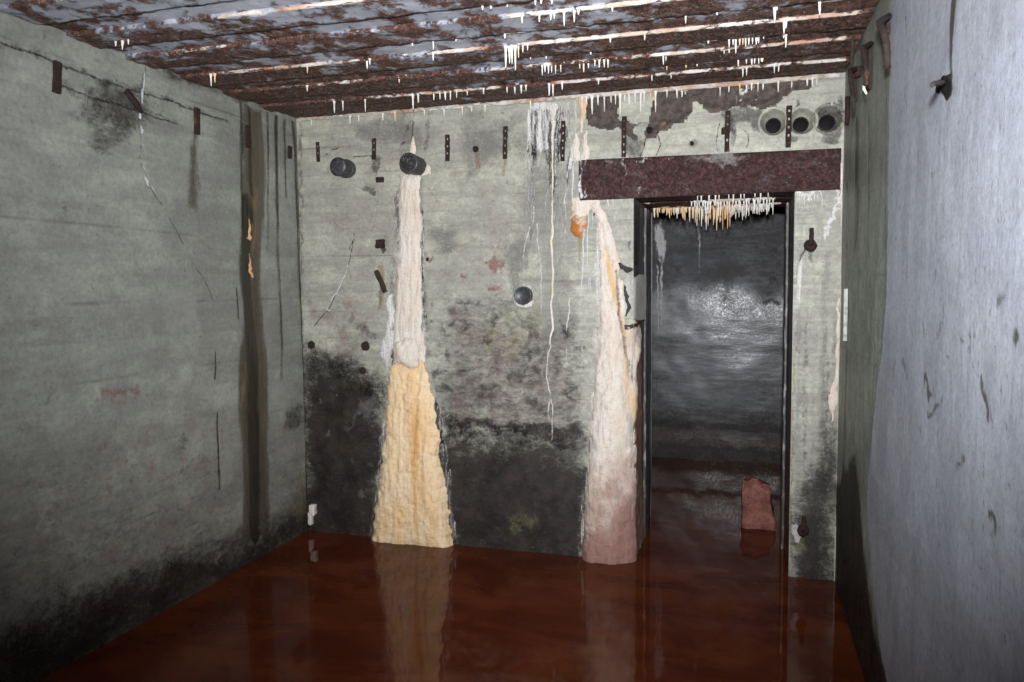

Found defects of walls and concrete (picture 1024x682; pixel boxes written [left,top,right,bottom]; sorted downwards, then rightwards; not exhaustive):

crack [1,42,228,240]
damp [421,10,862,76]
spalling [586,80,812,141]
crack [315,234,355,325]
damp [0,58,846,682]
damp [790,298,881,682]